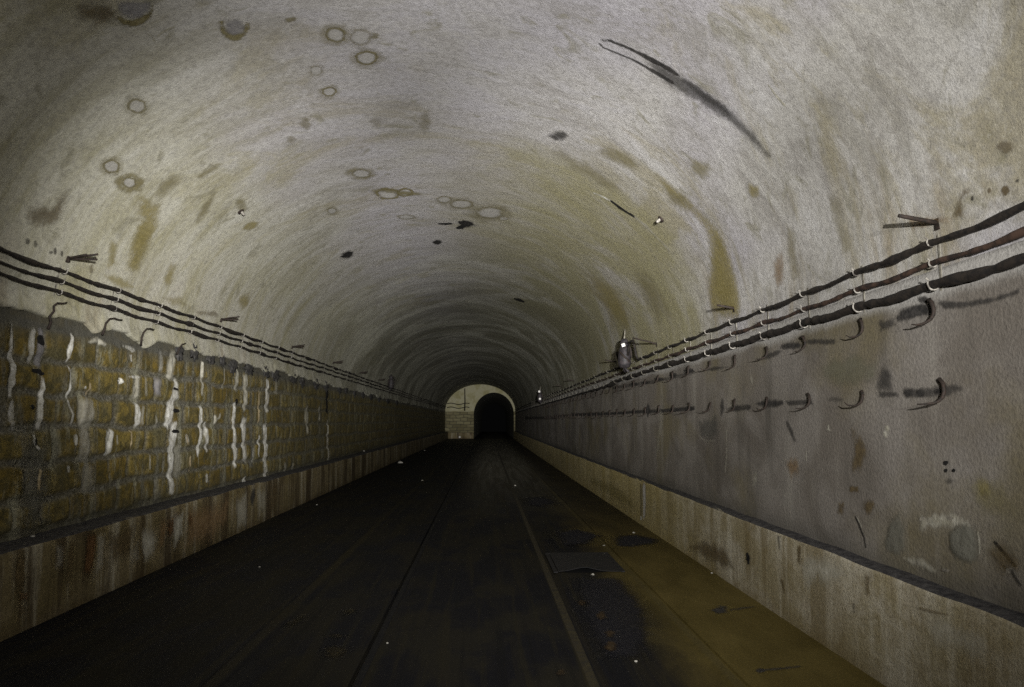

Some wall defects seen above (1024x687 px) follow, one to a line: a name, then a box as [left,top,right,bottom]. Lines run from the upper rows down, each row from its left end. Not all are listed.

water stain [325,28,378,65]
water stain [103,159,157,268]
water stain [373,188,418,199]
water stain [8,333,16,397]
water stain [28,329,46,450]
water stain [65,333,94,459]
water stain [104,352,269,494]